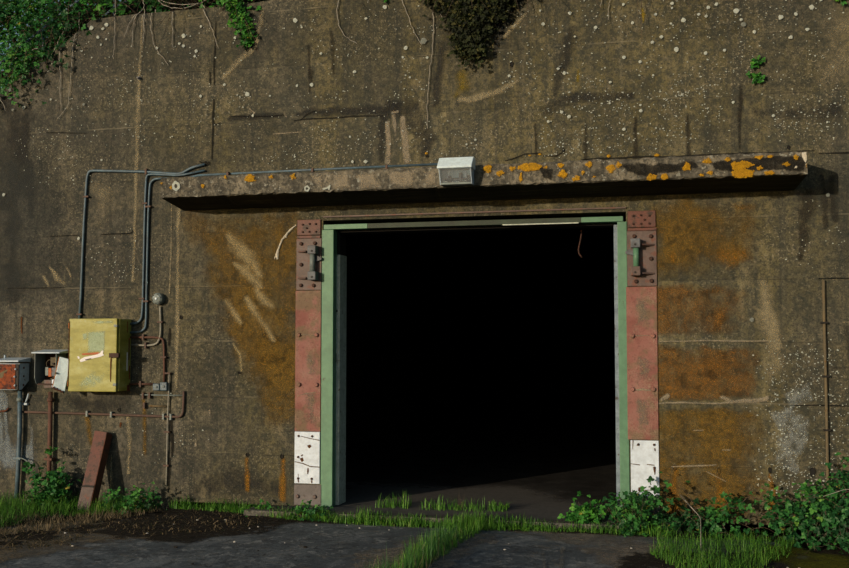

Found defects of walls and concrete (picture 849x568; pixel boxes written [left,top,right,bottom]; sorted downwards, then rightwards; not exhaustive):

leakage [548,30,633,110]
leakage [297,100,434,161]
leakage [0,94,58,302]
rust [647,286,725,332]
rust [658,346,754,399]
rust [653,408,754,522]